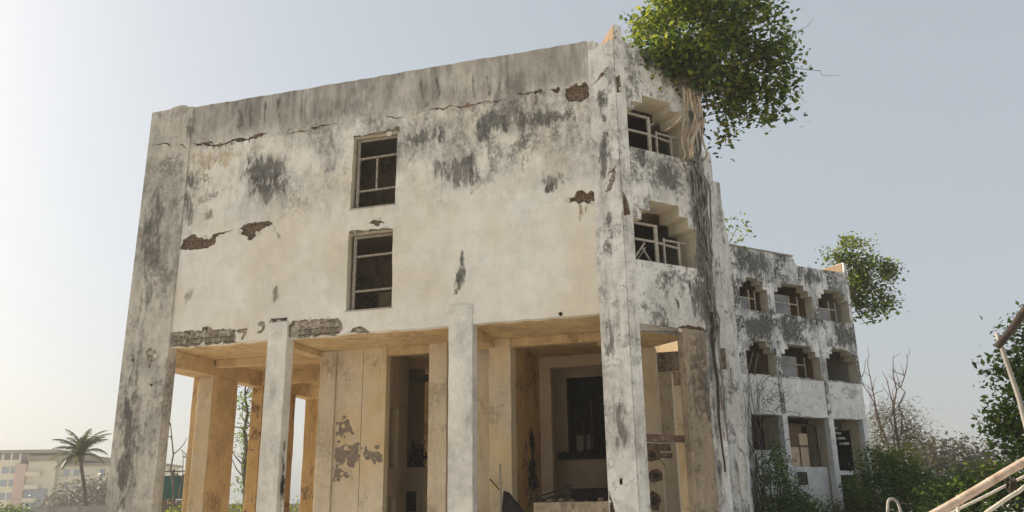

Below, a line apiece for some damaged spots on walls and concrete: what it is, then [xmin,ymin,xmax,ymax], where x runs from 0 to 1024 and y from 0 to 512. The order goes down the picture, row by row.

crack [429,92,534,110]
flaking render [534,81,589,102]
crack [154,123,338,149]
water stain [475,107,576,144]
water stain [597,90,611,179]
water stain [241,155,288,205]
flaking render [565,170,630,218]
flaking render [180,220,272,250]
water stain [454,251,466,294]
flaking render [171,321,265,348]
flaking render [288,317,369,339]
water stain [635,148,724,503]